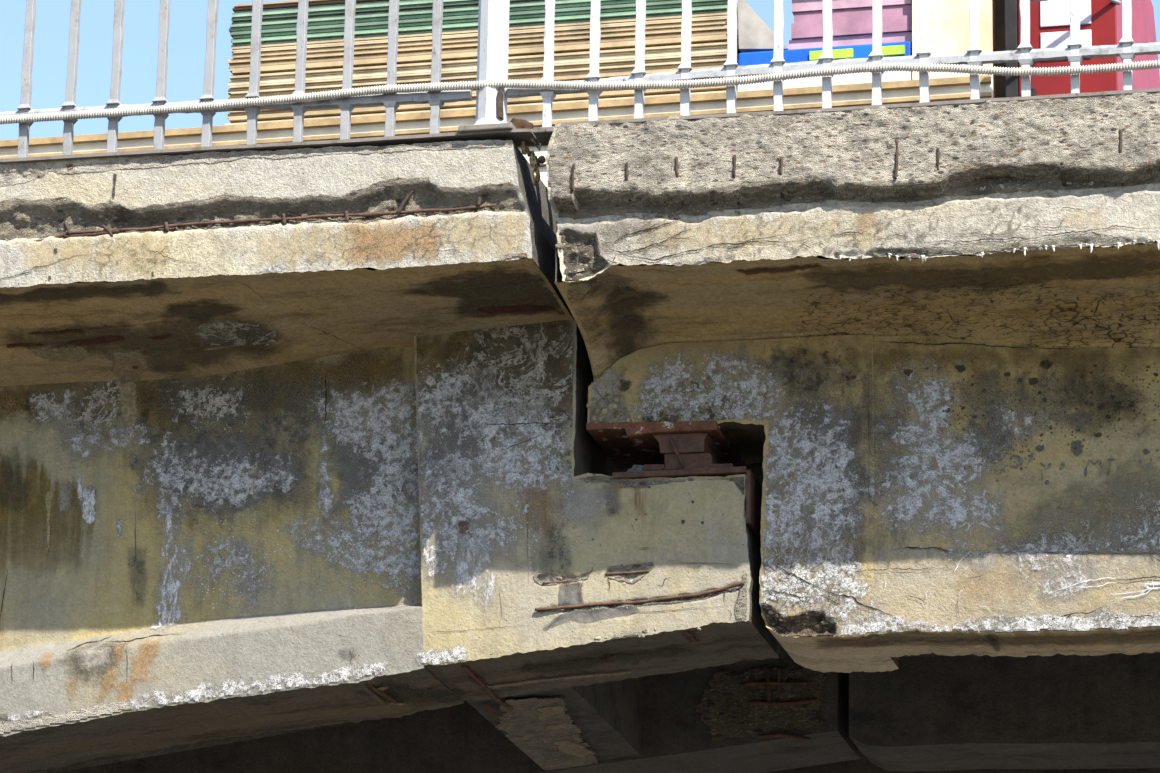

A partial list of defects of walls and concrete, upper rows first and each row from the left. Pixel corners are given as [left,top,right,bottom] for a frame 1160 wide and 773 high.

spalling [0,142,524,242]
spalling [527,93,1160,303]
crack [600,203,1157,264]
crack [796,274,1160,350]
water stain [0,320,619,629]
water stain [591,348,1160,635]
spalling [533,562,747,630]
spalling [761,604,837,637]
crack [1048,558,1160,623]
water stain [82,647,107,667]
rust [101,640,158,702]
water stain [416,646,467,665]